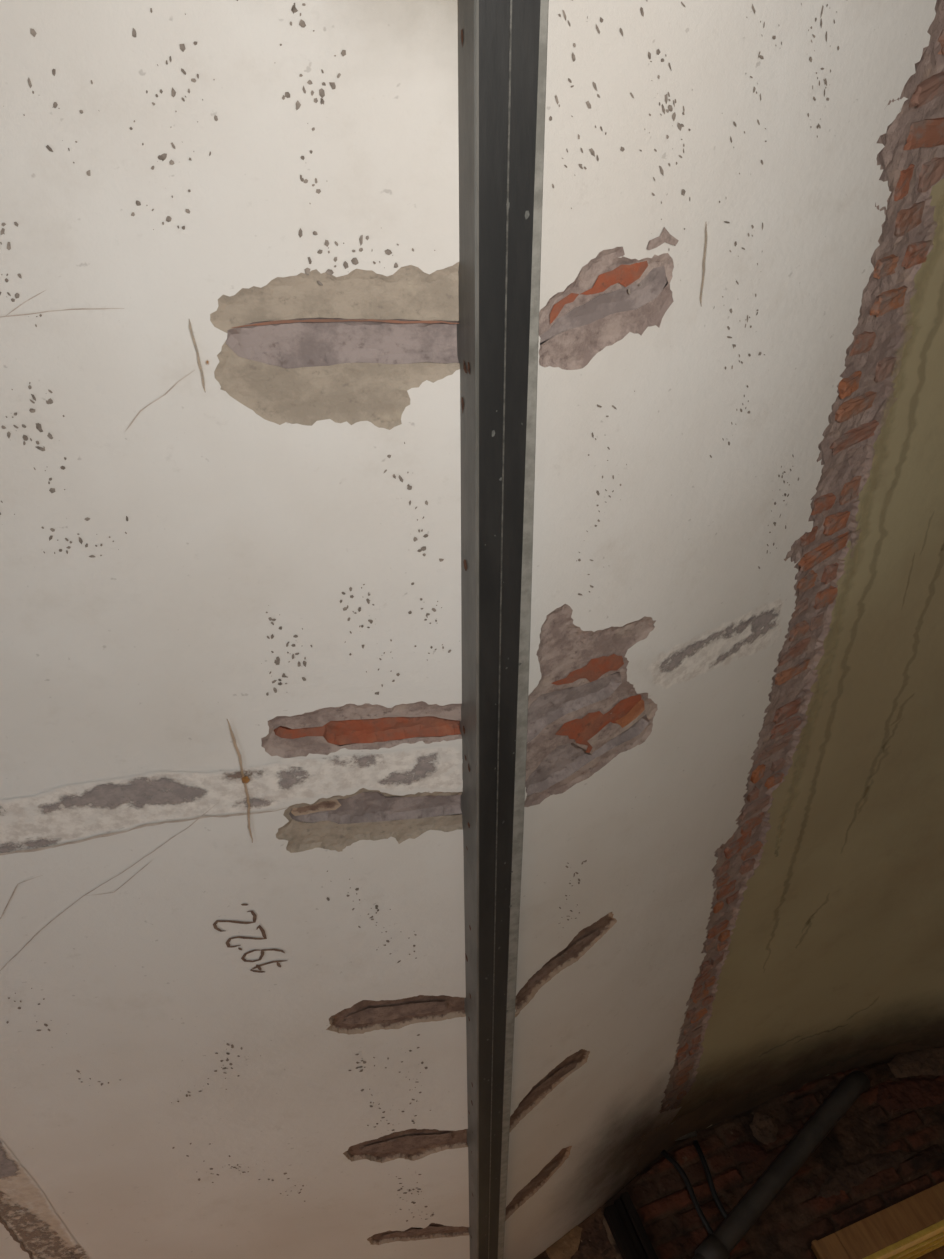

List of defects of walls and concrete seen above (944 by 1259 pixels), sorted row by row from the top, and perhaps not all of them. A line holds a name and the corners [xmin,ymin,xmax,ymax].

spalling [210,228,460,430]
spalling [539,219,685,370]
spalling [384,455,444,562]
flaking render [640,0,944,1110]
peeling [0,716,463,855]
flaking render [552,654,624,685]
flaking render [556,695,645,753]
peeling [0,1139,87,1259]